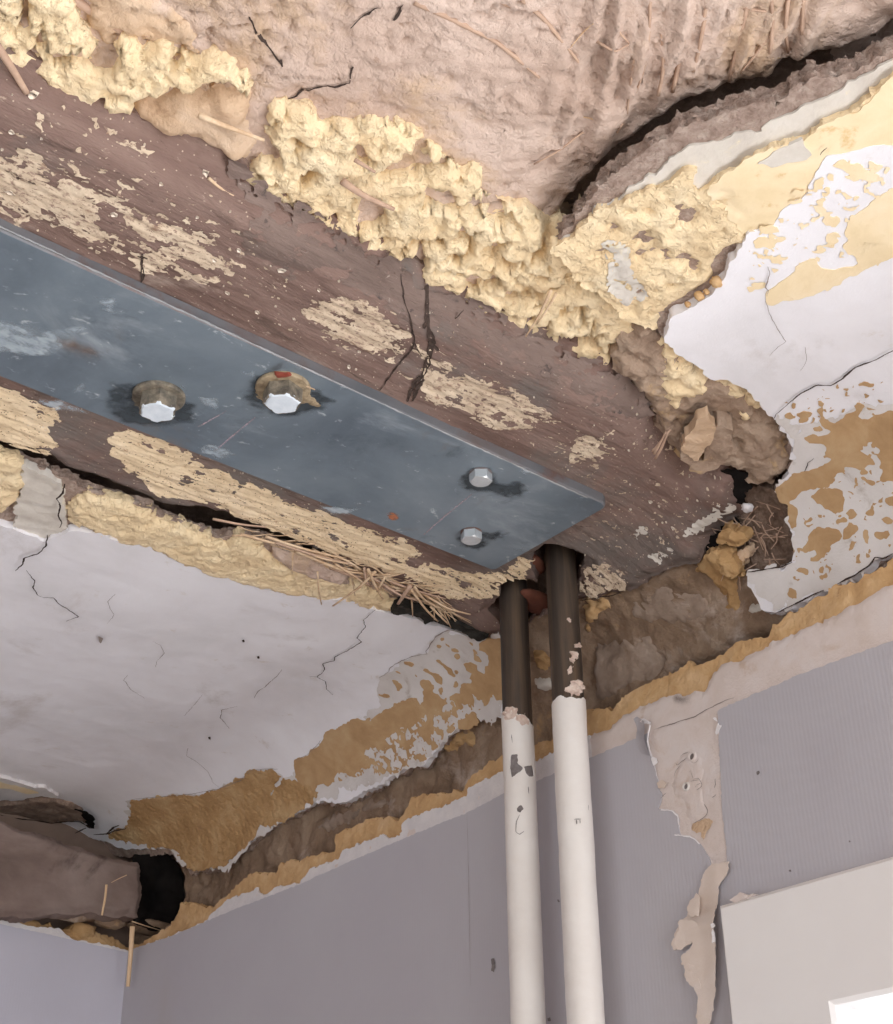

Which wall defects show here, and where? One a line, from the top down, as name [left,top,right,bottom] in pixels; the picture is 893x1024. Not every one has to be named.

crack [249,17,283,67]
crack [289,67,354,99]
crack [380,276,439,402]
spalling [0,0,893,736]
crack [15,484,79,619]
crack [309,610,375,695]
peeling [108,630,529,872]
spalling [0,774,95,829]
flaking render [19,739,554,951]
spalling [691,818,713,840]
peeling [674,893,700,950]